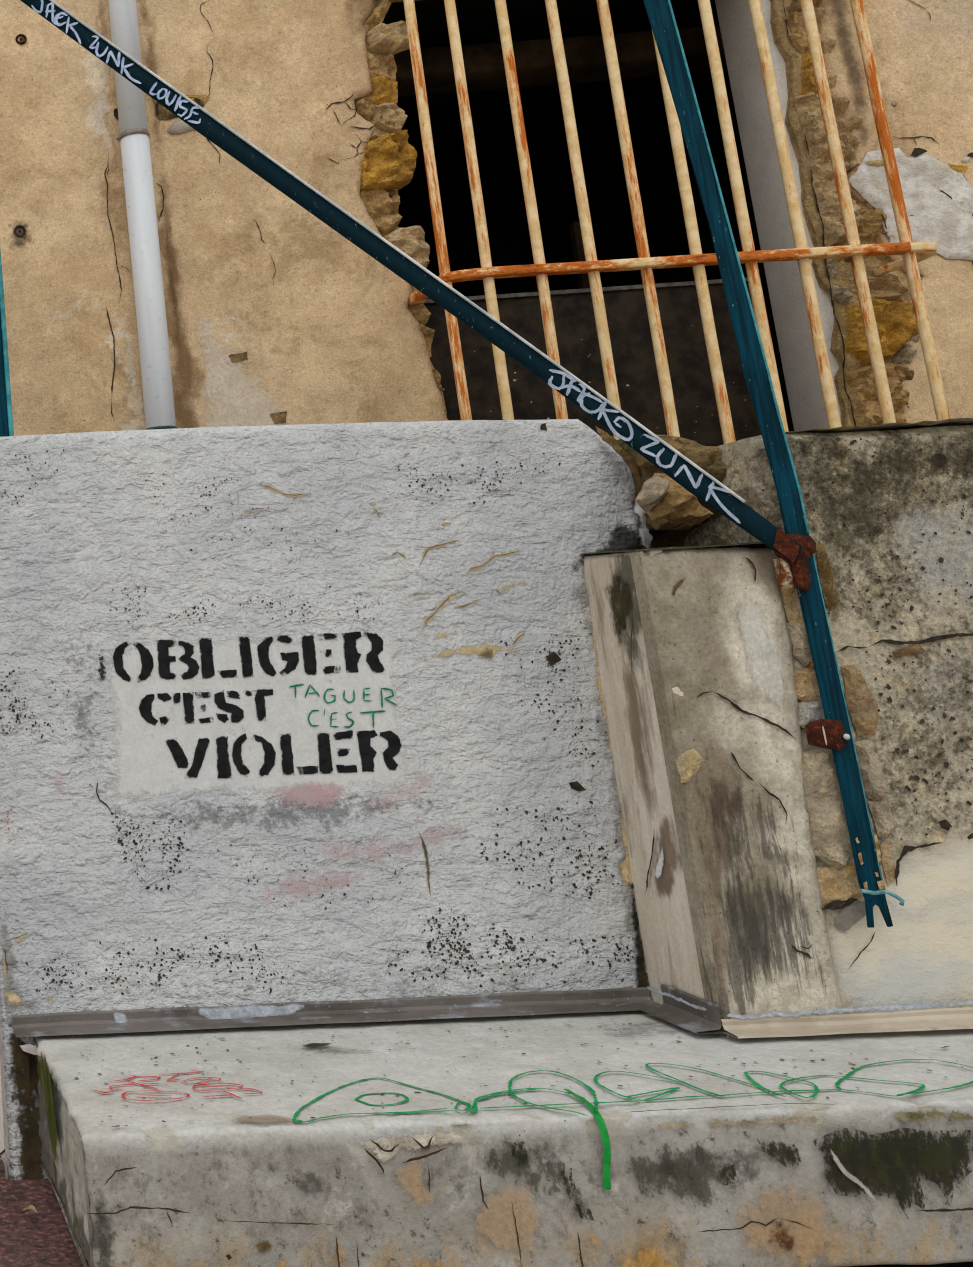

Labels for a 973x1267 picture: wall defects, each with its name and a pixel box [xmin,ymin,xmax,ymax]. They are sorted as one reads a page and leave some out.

crack [200,0,215,96]
flaking render [355,0,430,268]
crack [892,136,938,144]
flaking render [782,0,973,427]
flaking render [408,285,448,421]
crack [837,633,973,652]
crack [696,691,795,739]
water stain [727,876,811,983]